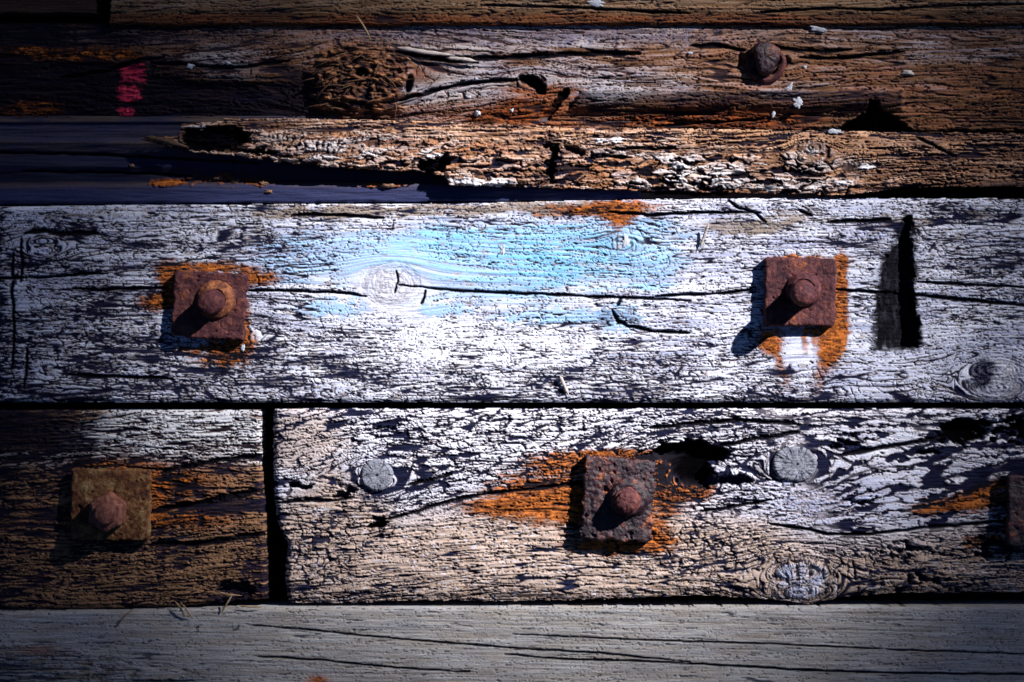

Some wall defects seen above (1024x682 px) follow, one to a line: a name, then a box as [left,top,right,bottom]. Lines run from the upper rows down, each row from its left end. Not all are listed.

crack [395,51,641,101]
rust [535,200,665,228]
rust [140,258,276,312]
rust [182,300,257,367]
crack [248,289,366,297]
crack [394,271,756,334]
rust [757,327,785,368]
rust [802,253,852,368]
crack [836,281,1024,307]
crack [378,473,583,521]
rust [462,449,717,556]
rust [911,479,1007,514]